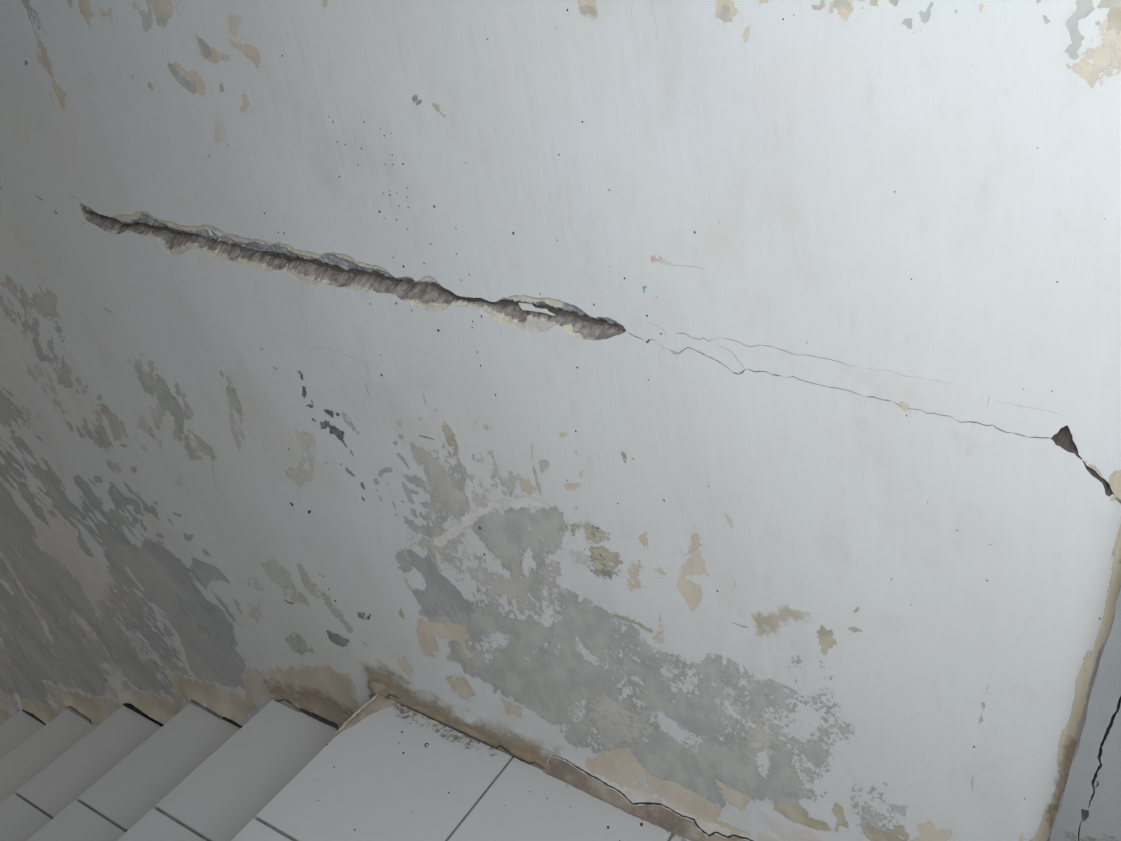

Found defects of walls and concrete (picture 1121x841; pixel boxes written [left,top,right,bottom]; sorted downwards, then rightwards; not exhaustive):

peeling [167,61,205,95]
peeling [196,14,260,68]
peeling [715,0,739,22]
peeling [811,0,899,21]
peeling [902,2,933,34]
peeling [1064,0,1121,88]
crack [629,322,1066,439]
peeling [0,274,371,707]
peeling [285,371,952,841]
crack [385,693,753,841]
crack [1078,696,1121,841]
water stain [620,787,783,841]